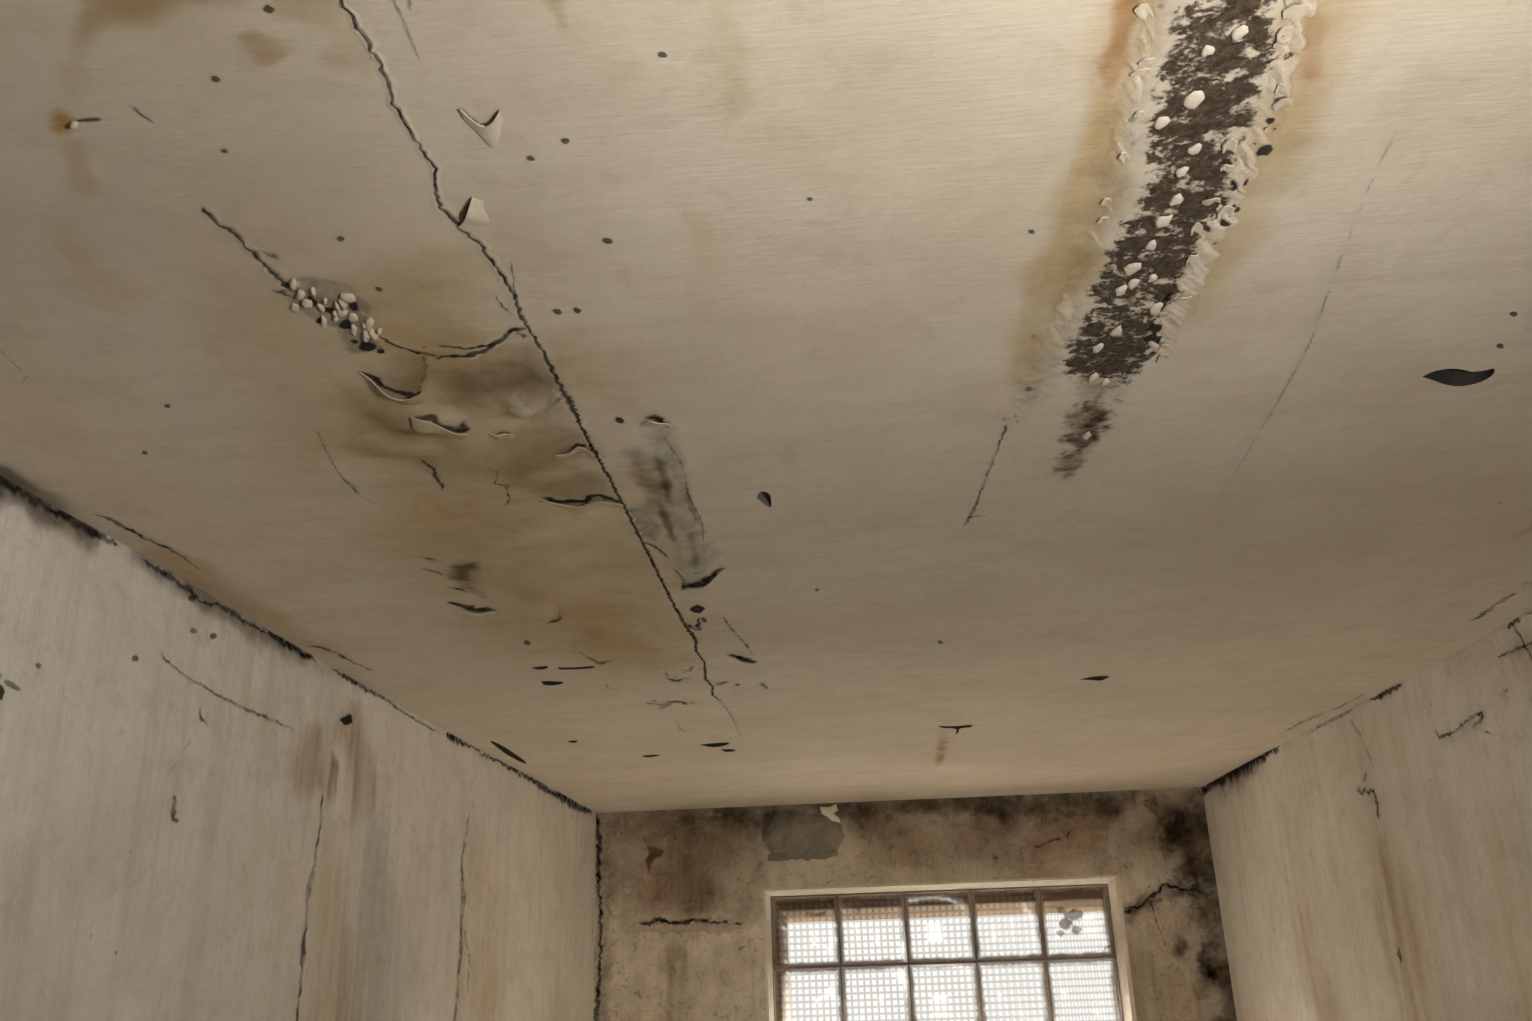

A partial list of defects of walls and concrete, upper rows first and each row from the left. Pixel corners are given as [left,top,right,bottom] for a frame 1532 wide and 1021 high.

spalling [988,0,1320,421]
crack [193,204,310,299]
crack [338,0,778,739]
crack [1474,594,1532,673]
crack [1437,712,1483,738]
leakage [714,805,778,825]
peeling [820,804,841,823]
leakage [807,802,868,815]
leakage [955,793,1079,818]
crack [1358,788,1379,817]
crack [1108,876,1206,948]
leakage [1164,746,1280,1021]